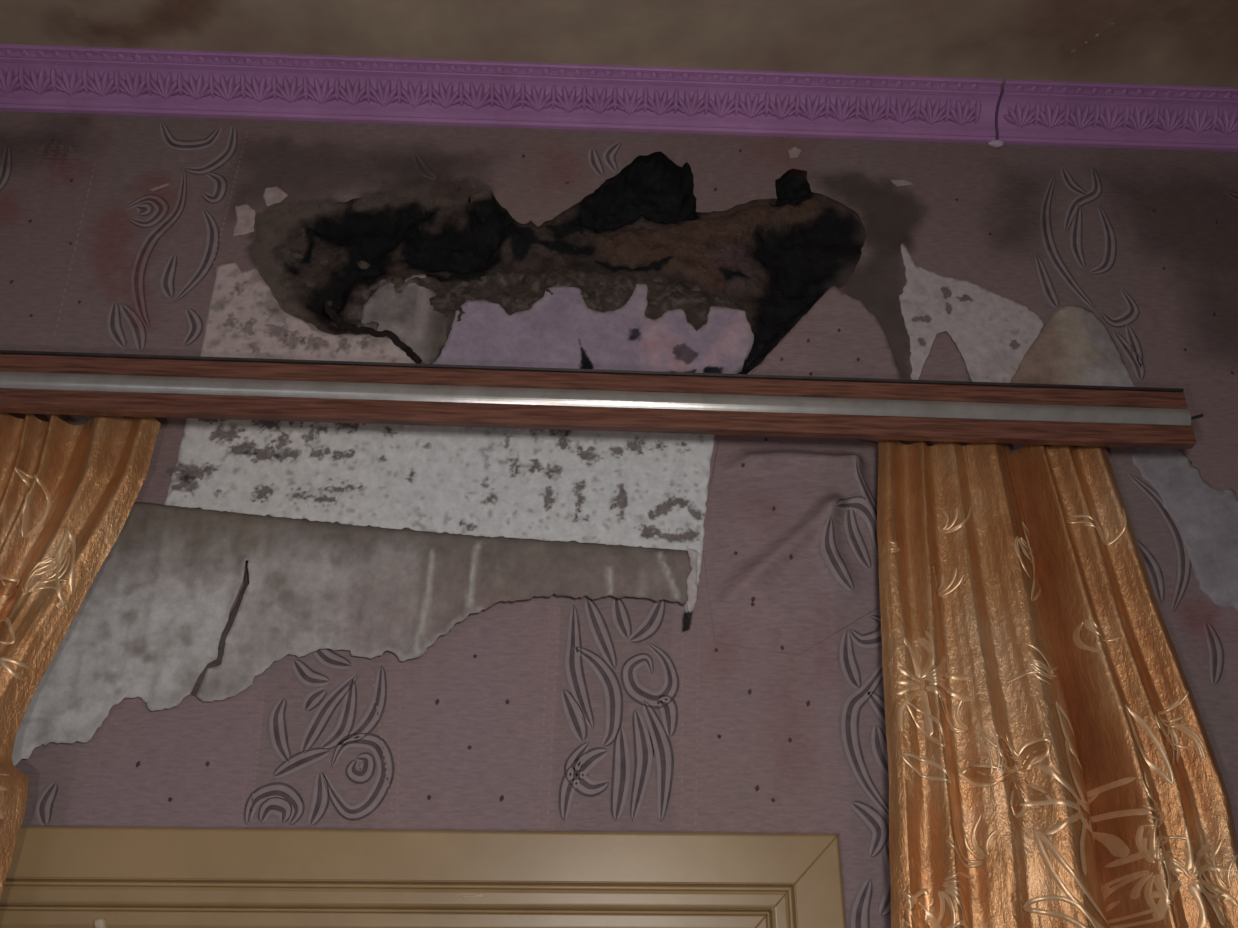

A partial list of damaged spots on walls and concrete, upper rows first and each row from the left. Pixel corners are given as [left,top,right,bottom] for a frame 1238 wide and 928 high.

flaking render [200,146,867,374]
flaking render [899,243,1135,387]
peeling [11,418,715,766]
flaking render [1131,447,1238,610]